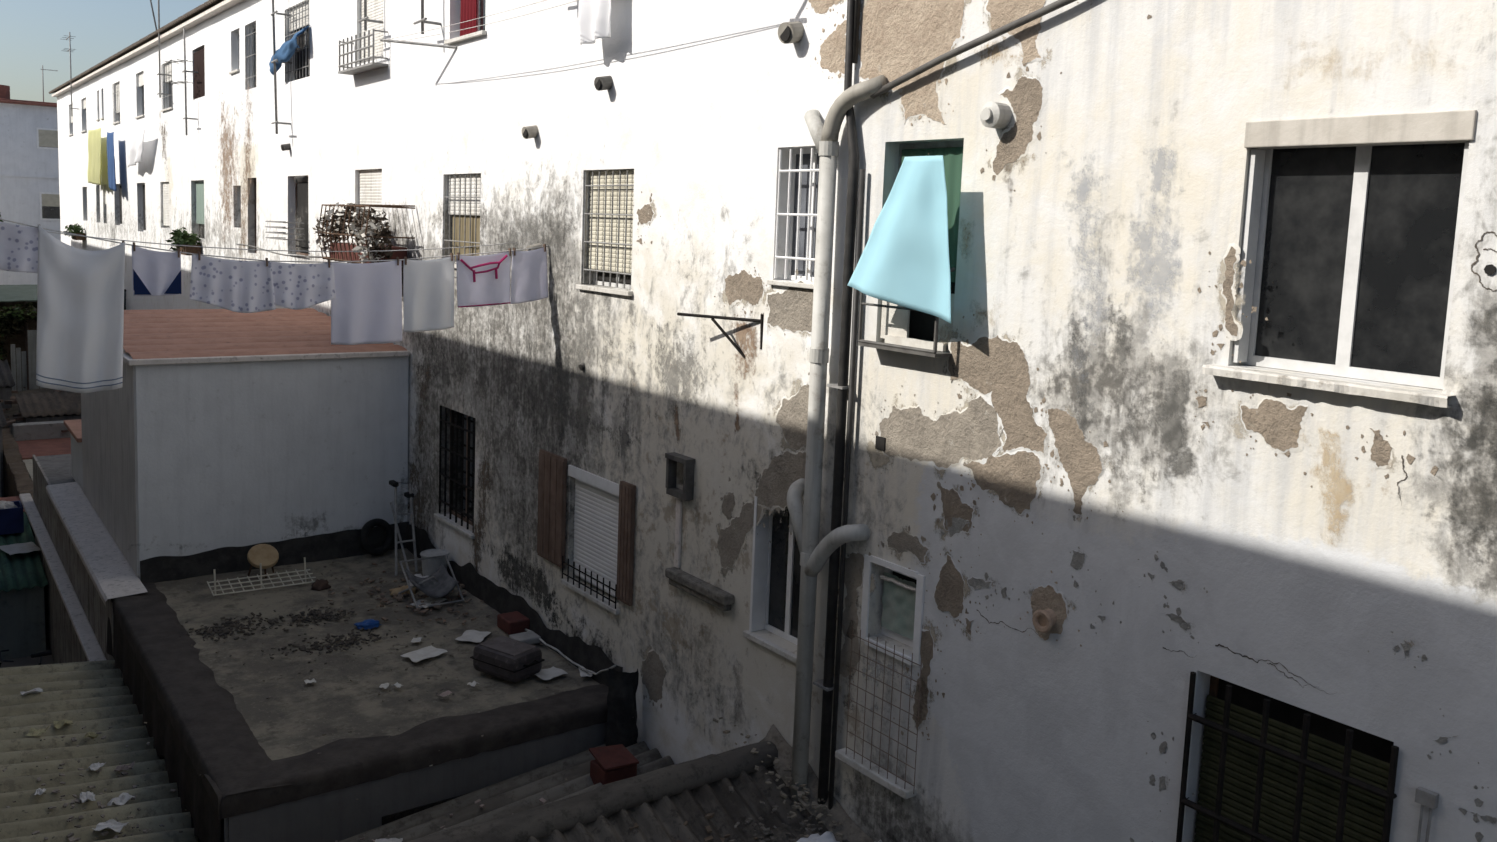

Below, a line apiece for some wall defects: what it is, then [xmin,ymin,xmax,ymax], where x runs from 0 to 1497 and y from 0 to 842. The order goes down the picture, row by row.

peeling [806,0,1062,191]
water stain [1075,179,1133,367]
water stain [470,448,612,662]
water stain [485,295,714,457]
peeling [709,372,810,582]
peeling [836,314,1122,740]
water stain [1069,318,1093,433]
water stain [1118,365,1193,478]
peeling [1138,551,1208,643]
crack [1163,644,1335,694]
peeling [1231,381,1313,457]
water stain [1449,386,1497,551]